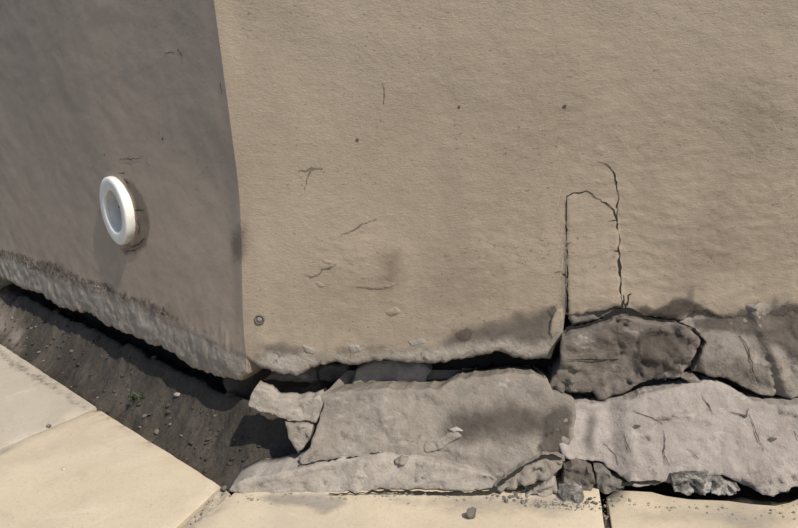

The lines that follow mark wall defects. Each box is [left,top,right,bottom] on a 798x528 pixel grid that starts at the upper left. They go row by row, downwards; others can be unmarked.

crack [32,291,223,385]
peeling [0,255,563,380]
peeling [248,380,324,454]
crack [252,361,358,392]
spalling [423,427,463,452]
leakage [454,306,556,341]
crack [432,351,618,372]
peeling [494,408,572,498]
crack [555,161,763,447]
crack [606,410,798,496]
leakage [640,298,798,356]
spalling [677,302,798,399]